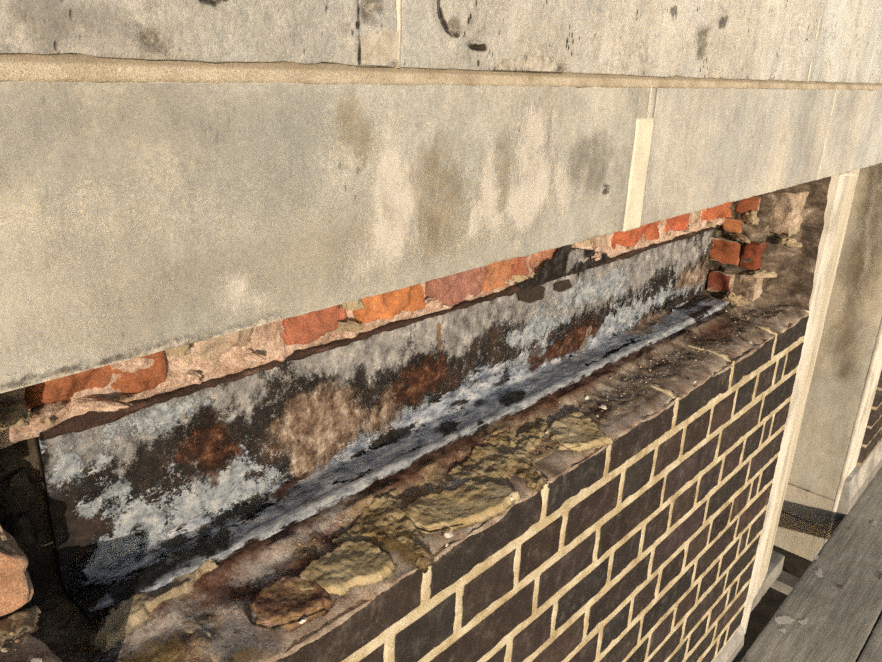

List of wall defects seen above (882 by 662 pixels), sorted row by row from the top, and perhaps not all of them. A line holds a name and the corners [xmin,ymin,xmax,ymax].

leakage [354,109,422,280]
leakage [467,104,575,237]
peeling [566,249,585,272]
spalling [0,313,281,393]
corrosion [265,324,448,507]
leakage [39,229,729,662]
peeling [371,421,419,446]
corrosion [372,430,486,490]
peeling [433,421,461,435]
peeling [493,376,527,407]
corrosion [515,310,672,418]
corrosion [192,520,307,605]